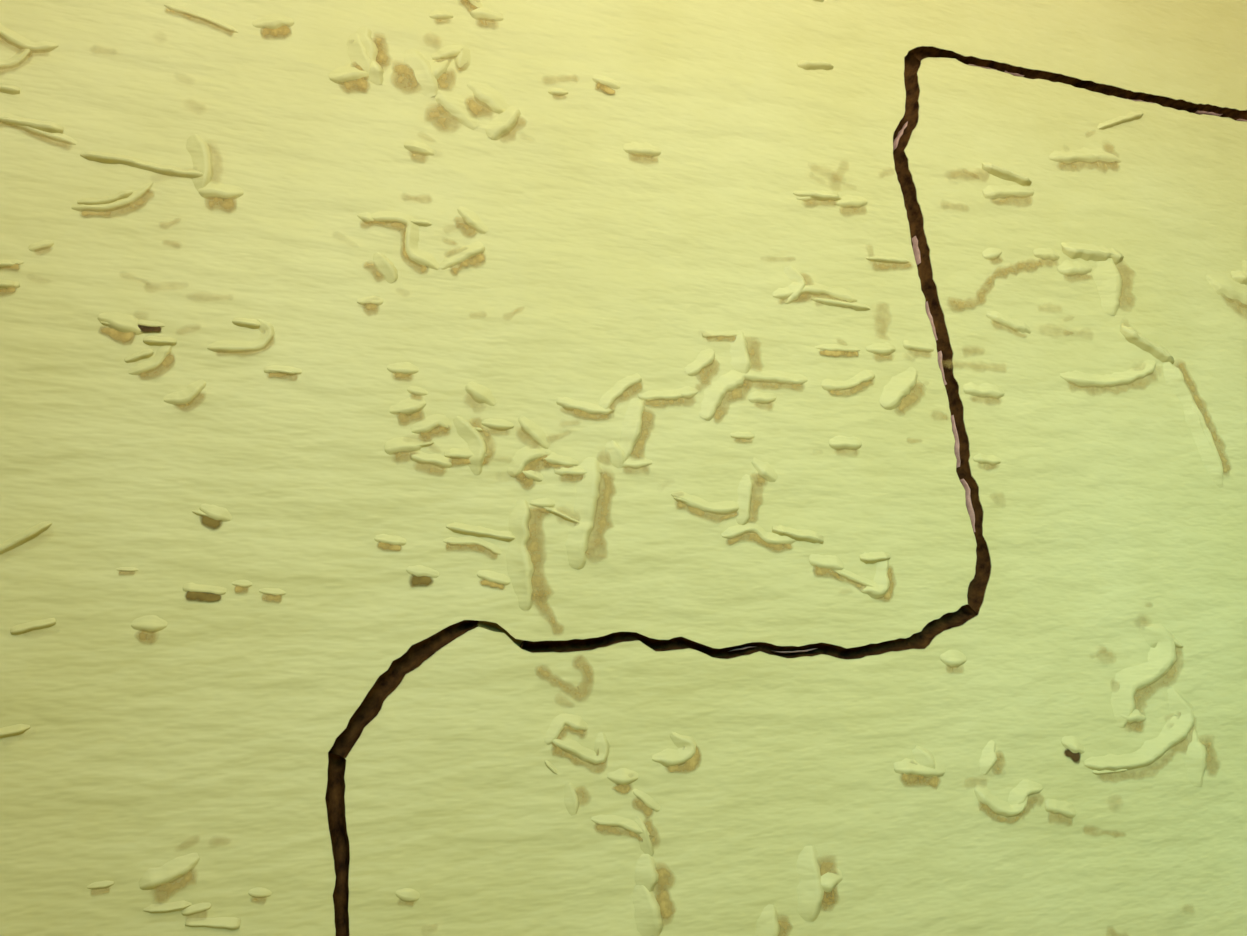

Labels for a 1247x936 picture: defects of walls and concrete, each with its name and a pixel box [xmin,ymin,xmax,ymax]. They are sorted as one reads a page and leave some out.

crack [325,46,1247,936]